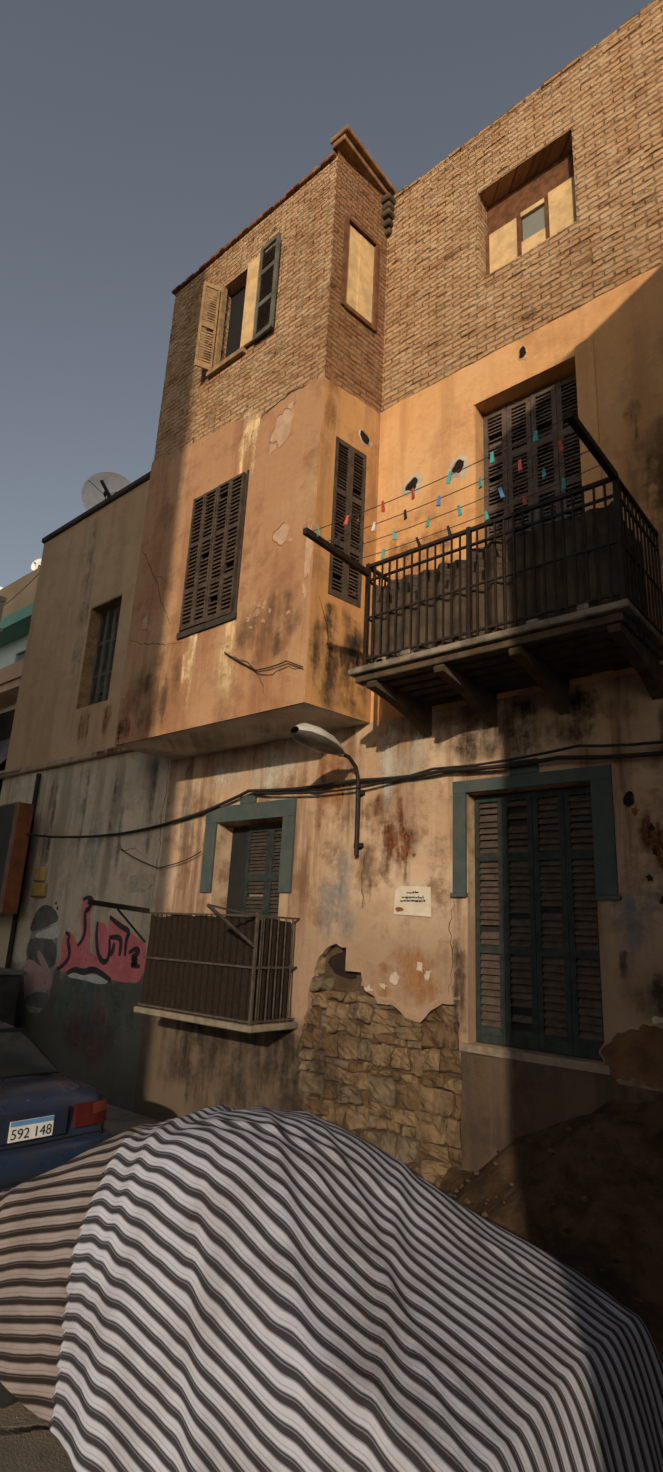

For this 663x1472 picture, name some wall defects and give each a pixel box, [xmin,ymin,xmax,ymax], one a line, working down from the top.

peeling [269,399,296,454]
water stain [181,633,197,682]
water stain [219,620,235,692]
crack [232,595,340,696]
rust [374,796,414,878]
flaking render [287,949,463,1188]
flaking render [599,1016,663,1088]